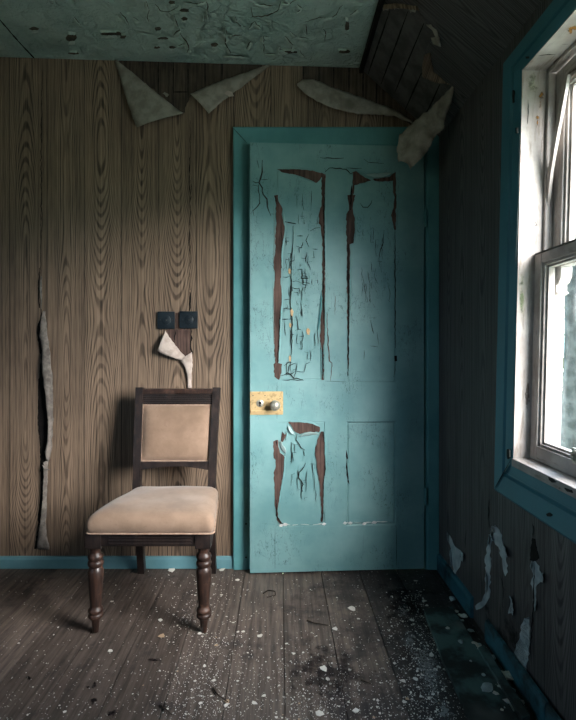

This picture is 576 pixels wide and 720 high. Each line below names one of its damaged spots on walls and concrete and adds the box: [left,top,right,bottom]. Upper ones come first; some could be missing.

crack [155,1,209,54]
crack [222,0,359,60]
crack [253,160,271,216]
peeling [273,195,294,380]
peeling [277,167,327,380]
peeling [346,170,398,332]
peeling [273,420,327,527]
peeling [447,533,463,574]
peeling [475,525,508,610]
peeling [514,524,543,670]